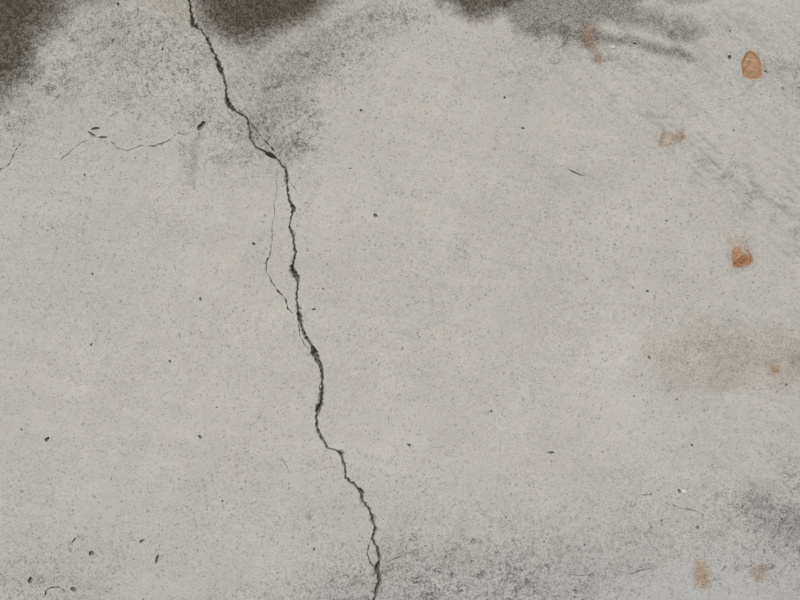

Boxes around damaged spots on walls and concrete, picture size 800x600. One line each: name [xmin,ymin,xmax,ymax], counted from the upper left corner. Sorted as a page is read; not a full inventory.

damp [0,0,68,94]
damp [196,0,327,43]
damp [454,0,689,57]
corrosion [733,247,752,267]
crack [188,0,401,600]